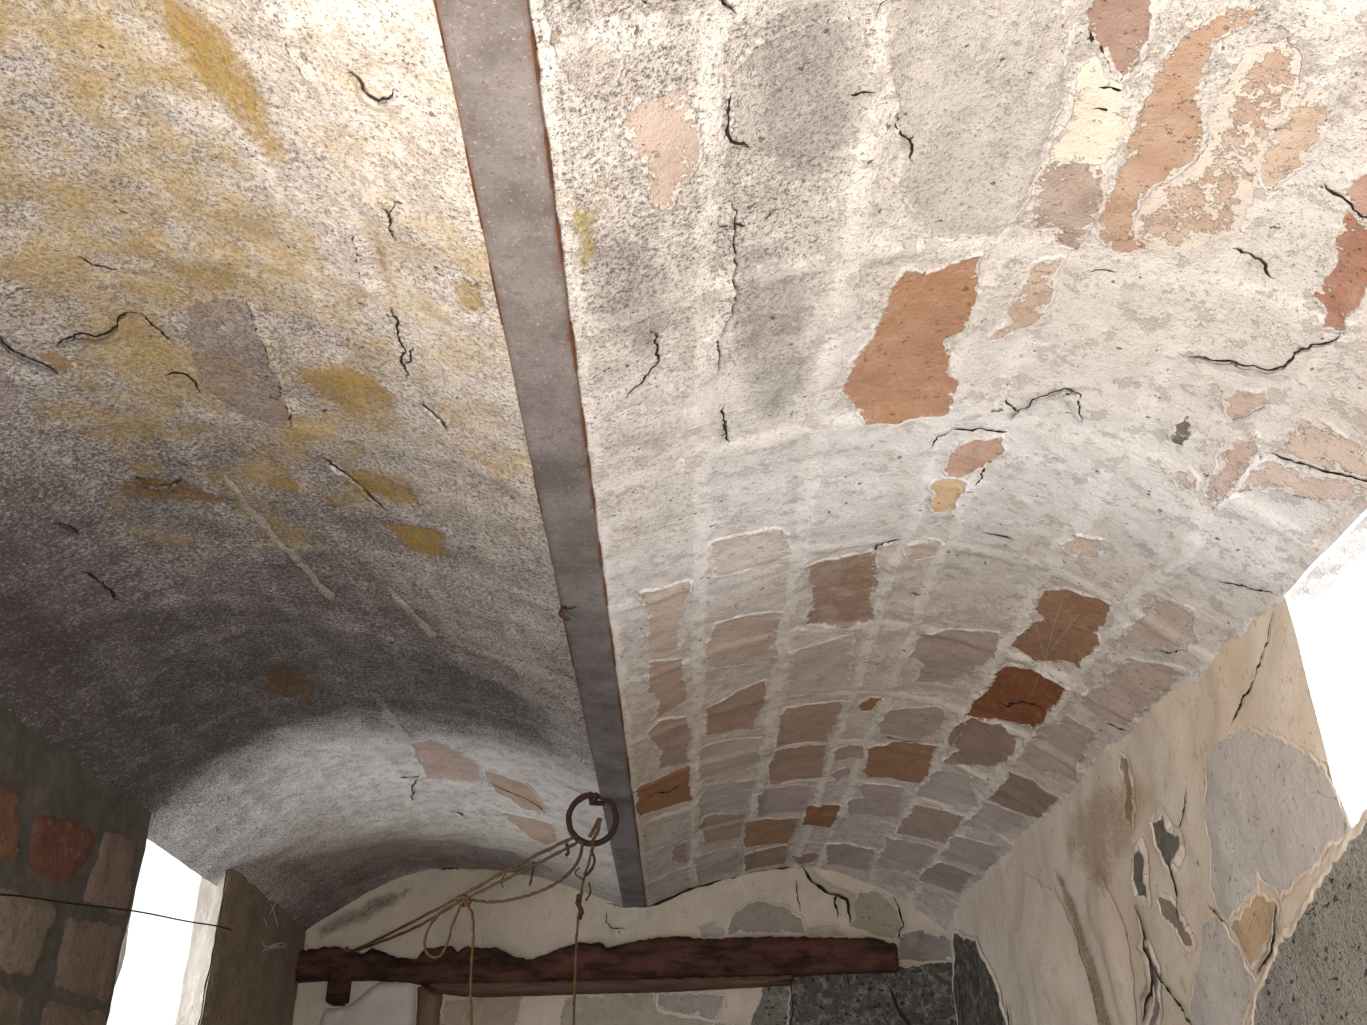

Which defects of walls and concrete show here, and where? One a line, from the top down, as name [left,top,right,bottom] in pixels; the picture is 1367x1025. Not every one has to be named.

crack [642,0,737,20]
crack [876,0,905,22]
water stain [146,0,285,163]
peeling [724,0,1334,426]
flaking render [1304,163,1367,334]
crack [0,312,201,394]
crack [1189,332,1350,381]
flaking render [926,433,1008,514]
flaking render [1163,386,1367,507]
crack [1218,581,1277,725]
flaking render [409,738,560,846]
flaking render [633,548,1202,1025]